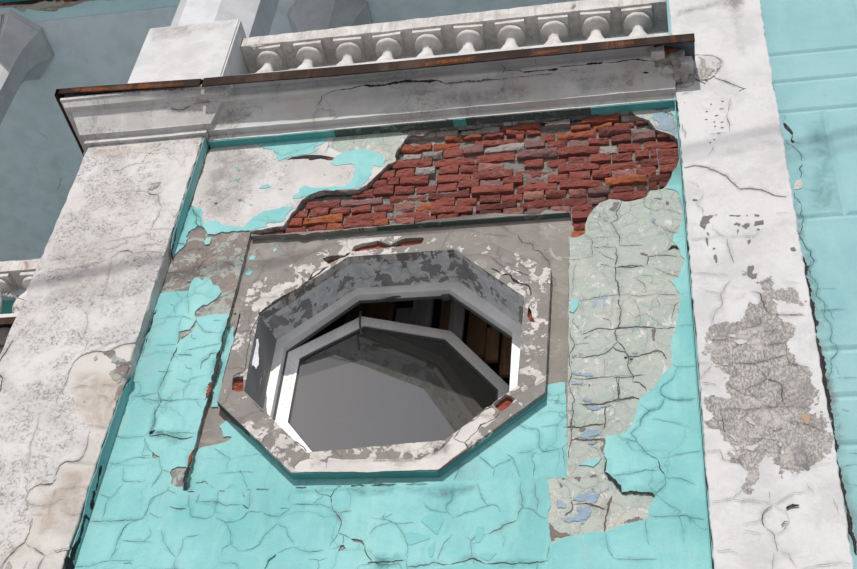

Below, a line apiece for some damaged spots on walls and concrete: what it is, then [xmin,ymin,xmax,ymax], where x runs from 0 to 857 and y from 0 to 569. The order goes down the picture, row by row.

crack [314,59,686,127]
crack [45,182,205,291]
peeling [699,214,717,262]
peeling [730,214,764,235]
crack [645,55,854,439]
crack [0,201,734,569]
peeling [170,109,685,544]
flaking render [701,265,836,494]
crack [715,488,853,568]